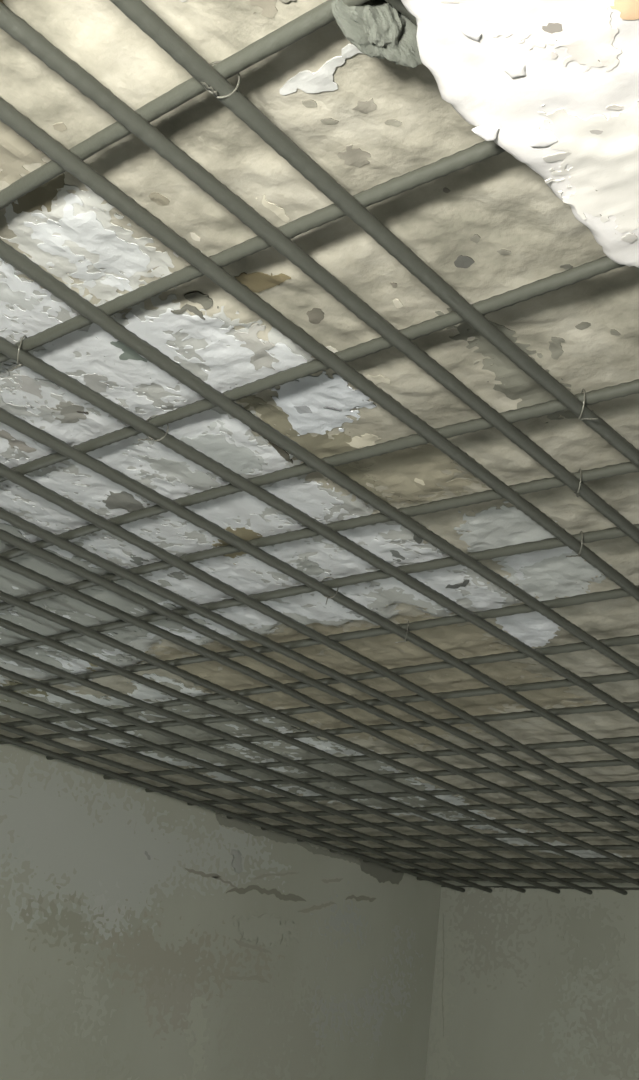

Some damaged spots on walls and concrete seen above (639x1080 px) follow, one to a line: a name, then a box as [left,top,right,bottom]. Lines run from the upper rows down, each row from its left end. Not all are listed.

spalling [385,0,417,26]
spalling [542,23,563,34]
spalling [352,98,377,114]
spalling [337,145,371,168]
spalling [543,152,572,162]
peeling [62,240,101,273]
spalling [454,255,474,268]
spalling [307,308,324,324]
spalling [549,337,565,360]
peeling [0,437,30,461]
peeling [183,530,211,544]
crack [185,868,376,913]